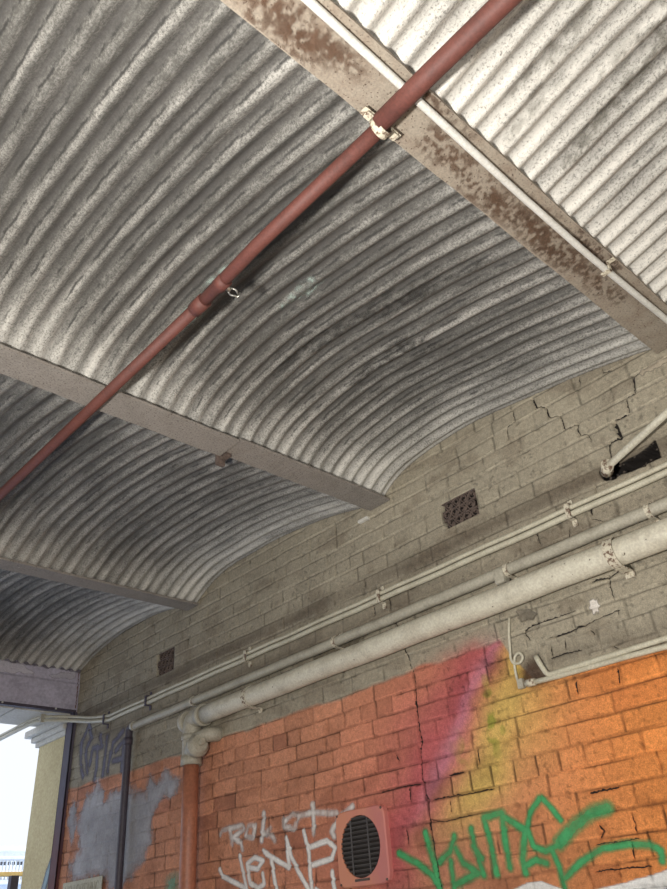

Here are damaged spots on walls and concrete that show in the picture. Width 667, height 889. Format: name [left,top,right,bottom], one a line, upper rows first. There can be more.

corrosion [246,0,354,67]
corrosion [423,126,624,300]
crack [533,374,638,488]
spalling [599,441,661,481]
crack [525,572,620,659]
crack [382,649,493,887]